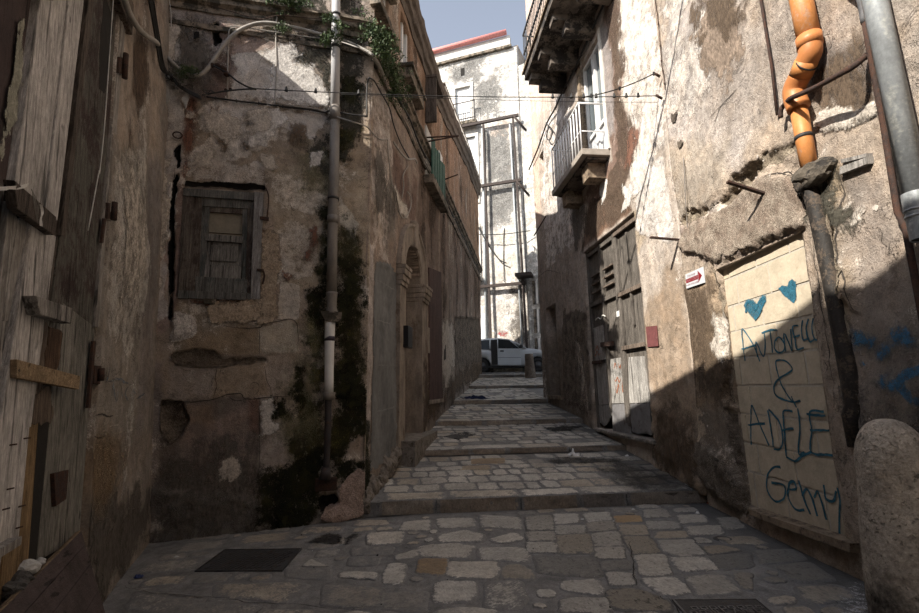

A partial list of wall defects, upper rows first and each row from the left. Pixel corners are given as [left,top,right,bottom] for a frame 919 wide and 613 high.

peeling [168,23,181,68]
peeling [186,41,329,170]
peeling [160,158,175,256]
spalling [182,180,266,190]
spalling [681,142,796,226]
peeling [112,161,148,311]
peeling [172,314,193,341]
spalling [171,348,266,368]
spalling [159,400,189,443]